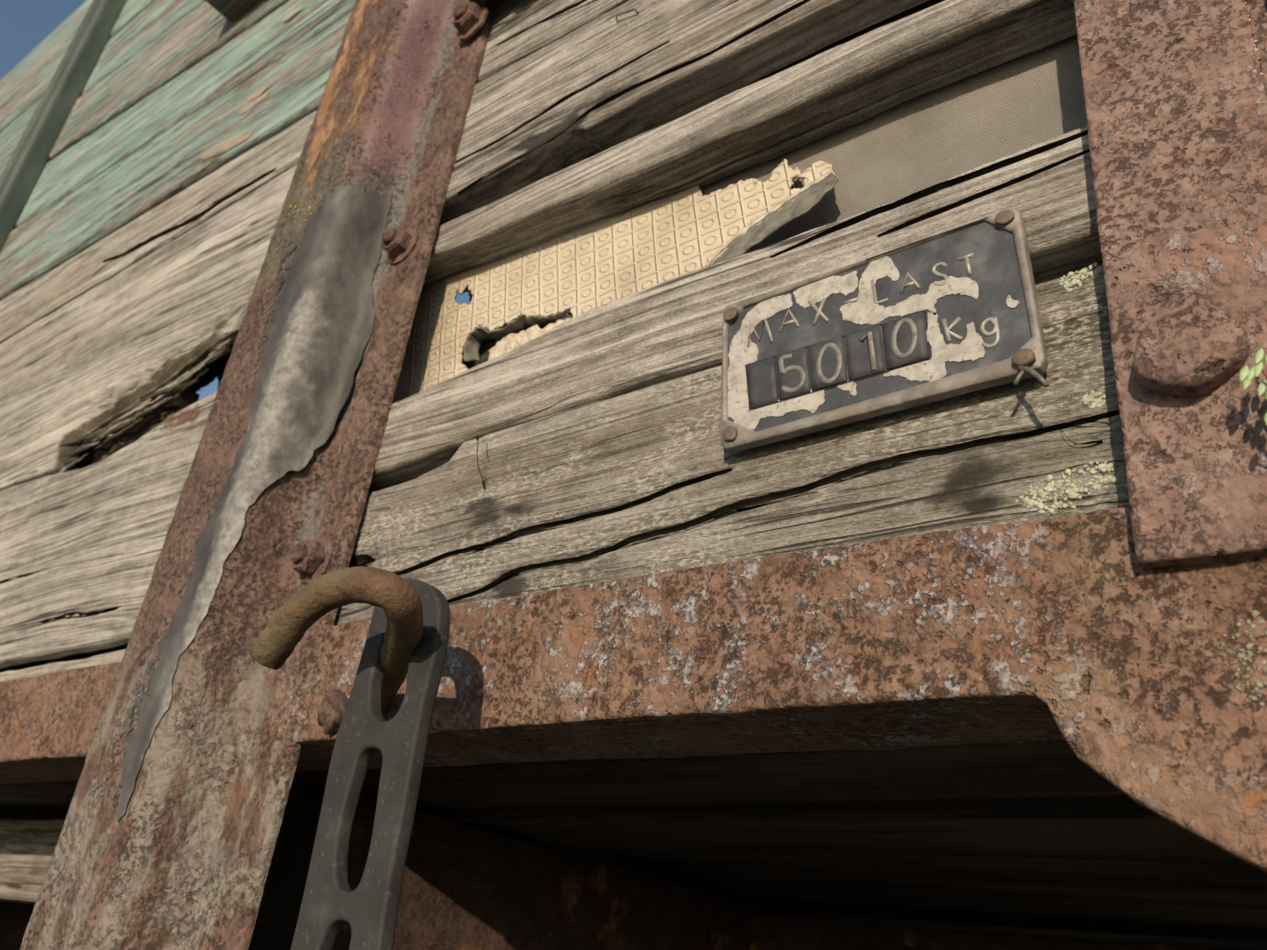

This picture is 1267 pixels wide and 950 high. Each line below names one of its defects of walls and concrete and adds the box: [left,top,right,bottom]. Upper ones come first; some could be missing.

peeling [182,84,270,174]
corrosion [302,0,393,198]
crack [455,0,810,195]
peeling [705,169,839,266]
corrosion [164,404,199,430]
peeling [117,177,392,821]
crack [348,410,1120,603]